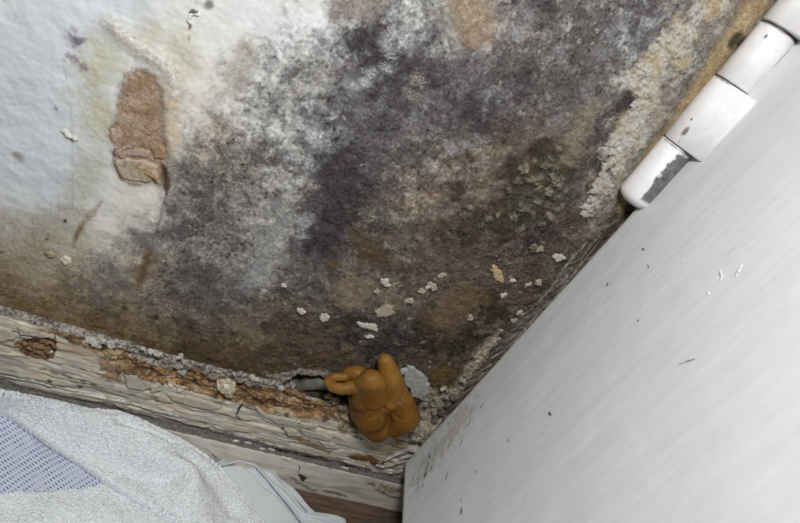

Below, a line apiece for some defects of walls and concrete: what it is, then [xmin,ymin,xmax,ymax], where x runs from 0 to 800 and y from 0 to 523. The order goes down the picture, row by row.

spalling [108,69,171,190]
water stain [0,0,777,407]
spalling [0,305,339,400]
peeling [356,304,395,339]
peeling [0,374,340,460]